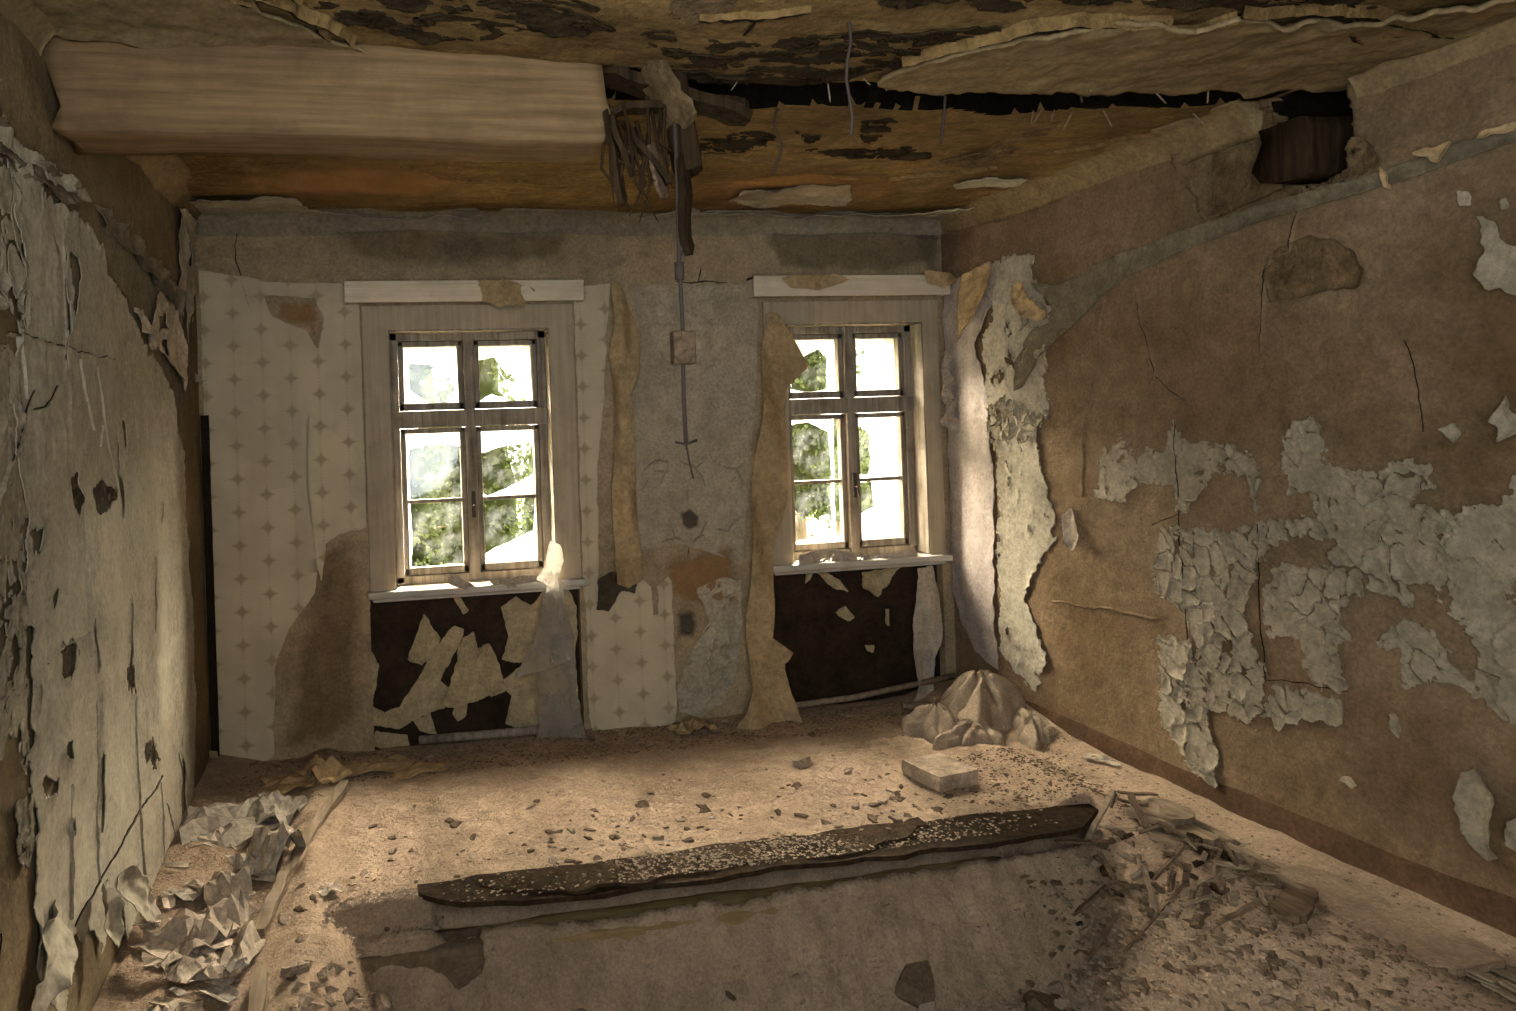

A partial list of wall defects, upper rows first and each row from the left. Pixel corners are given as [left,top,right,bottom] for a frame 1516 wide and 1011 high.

flaking render [32,0,616,54]
flaking render [189,196,483,220]
flaking render [638,0,1516,692]
crack [1076,293,1108,497]
crack [1258,210,1301,353]
peeling [0,104,251,1011]
peeling [371,590,595,755]
crack [1051,421,1188,640]
peeling [1093,415,1516,789]
peeling [1452,767,1516,861]